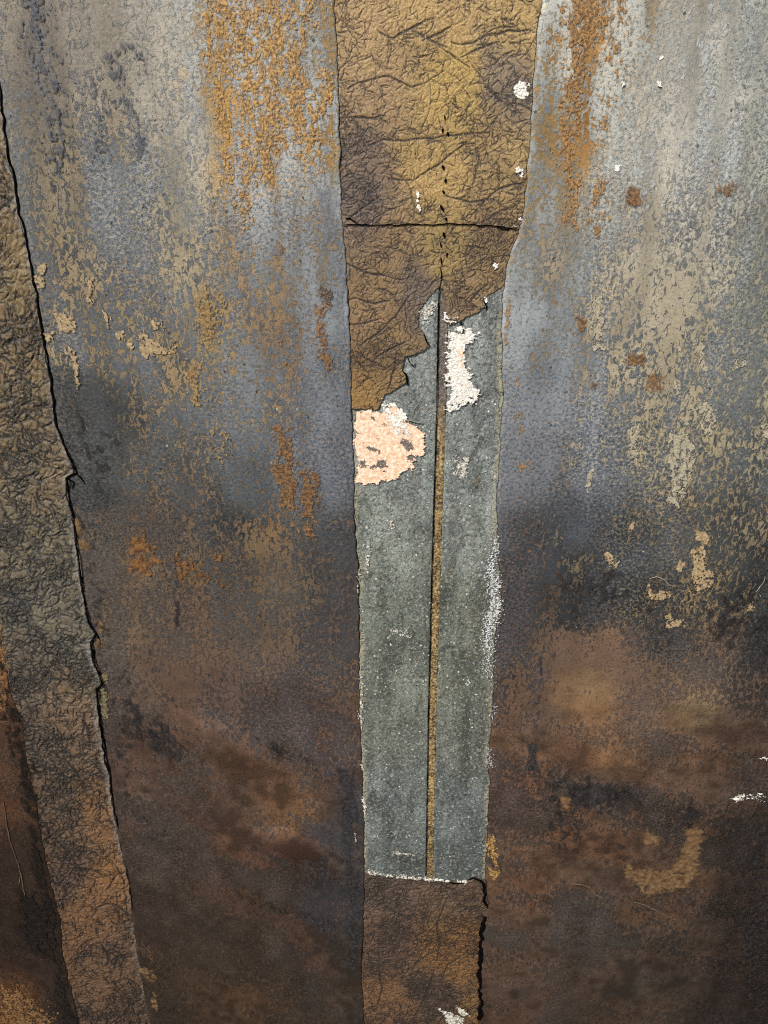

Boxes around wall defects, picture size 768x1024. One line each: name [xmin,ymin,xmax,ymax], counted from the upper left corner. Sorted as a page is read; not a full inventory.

rust [197,0,337,232]
rust [547,0,642,244]
peeling [419,301,481,412]
crack [0,86,118,827]
rust [268,424,321,541]
peeling [353,396,426,485]
crack [346,165,517,790]
peeling [450,455,469,479]
rust [128,531,223,586]
peeling [675,530,716,592]
crack [3,800,26,896]
crack [448,877,488,1021]